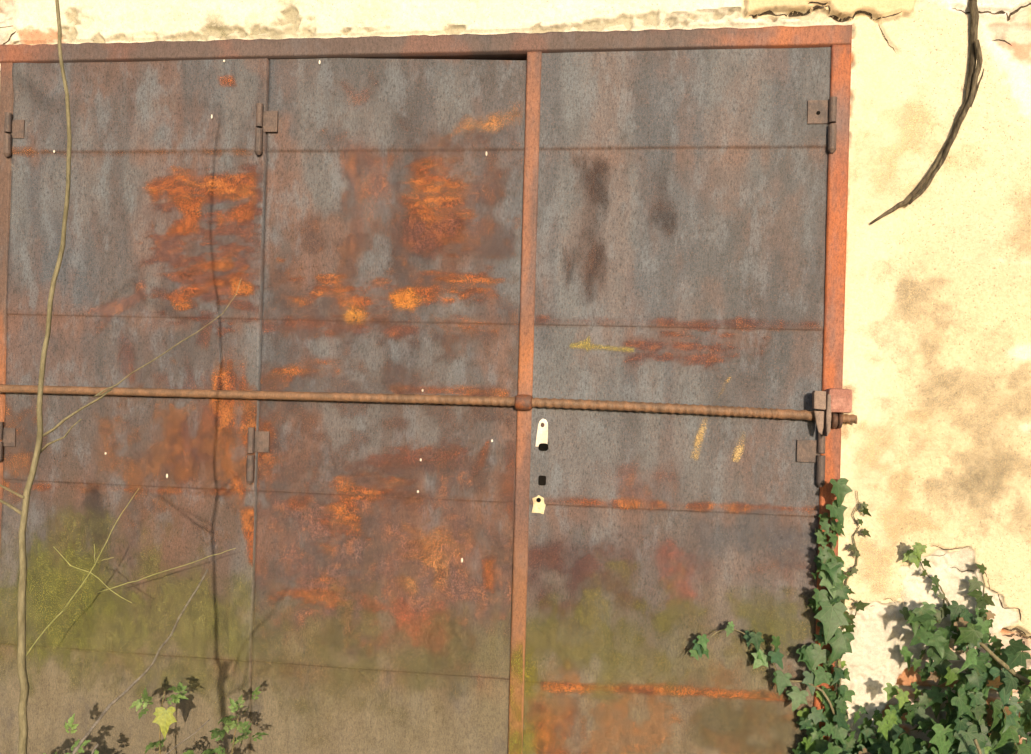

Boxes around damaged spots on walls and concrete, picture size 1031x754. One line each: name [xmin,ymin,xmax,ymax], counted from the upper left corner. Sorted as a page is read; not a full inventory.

flaking render [158,6,561,41]
flaking render [665,7,852,30]
rust [95,166,272,331]
rust [296,274,415,336]
rust [390,271,497,309]
rust [626,319,759,366]
rust [323,475,414,531]
peeling [841,547,1031,754]